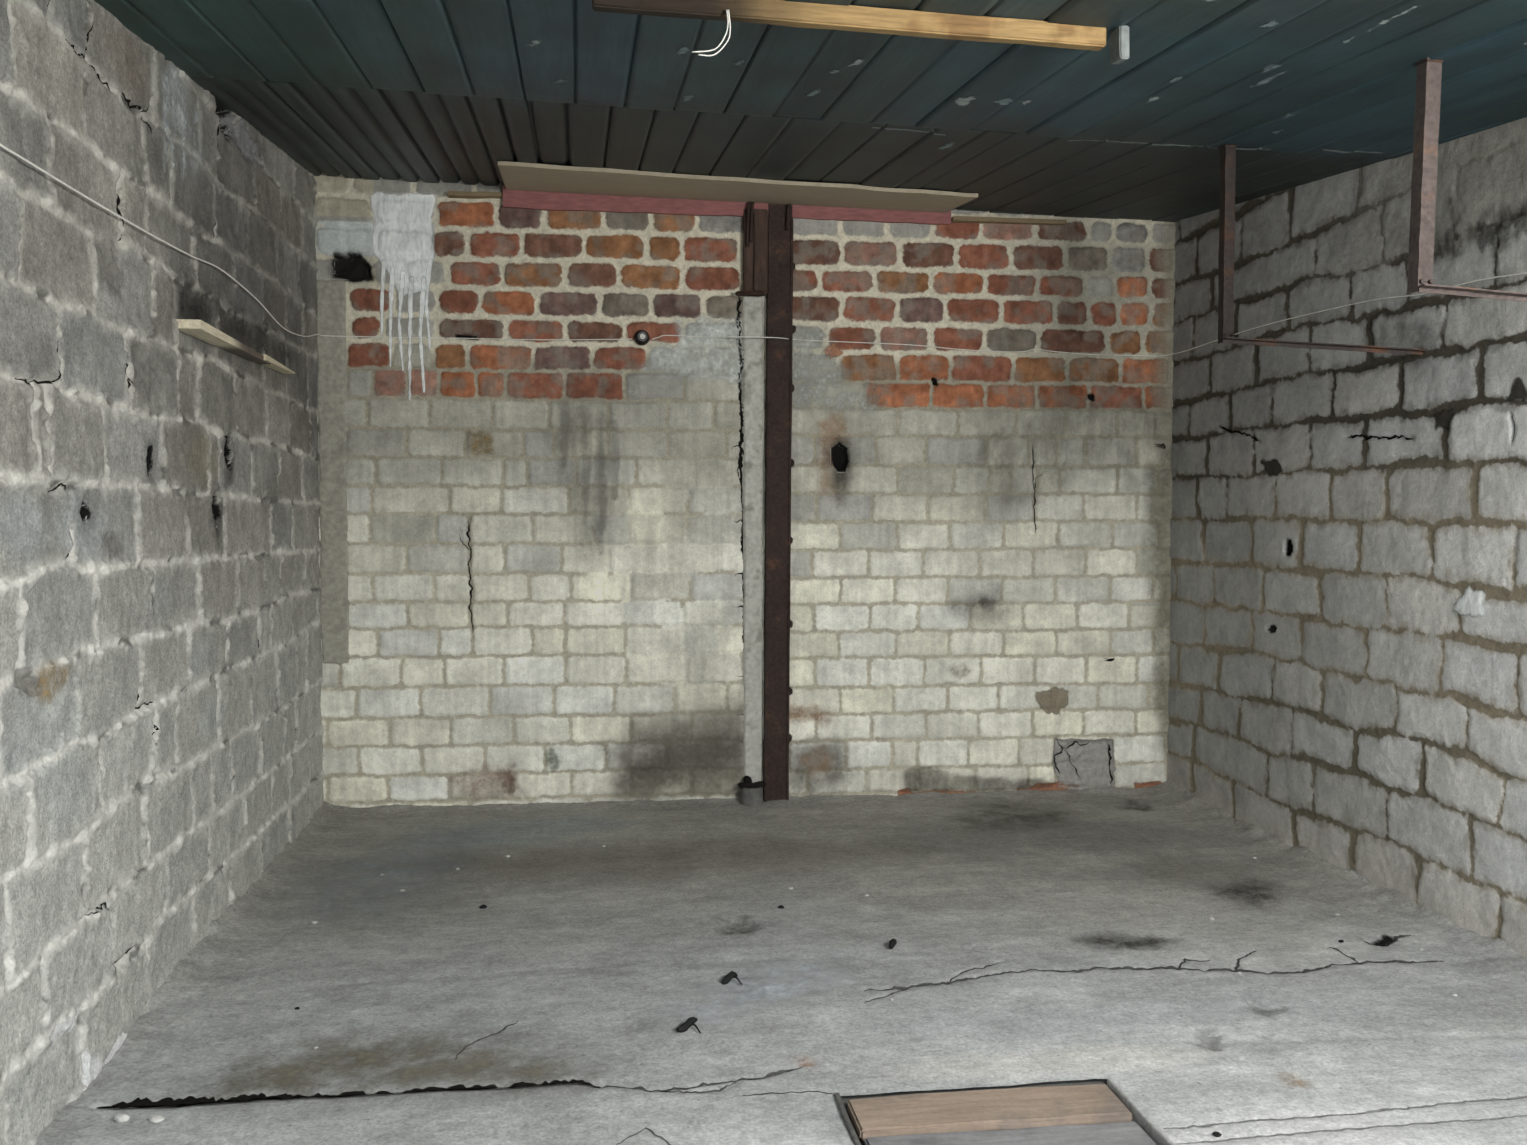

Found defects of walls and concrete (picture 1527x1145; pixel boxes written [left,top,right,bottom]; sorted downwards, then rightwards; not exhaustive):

damp [371,192,435,400]
damp [620,715,744,800]
crack [864,935,1437,1004]
crack [97,1021,833,1145]